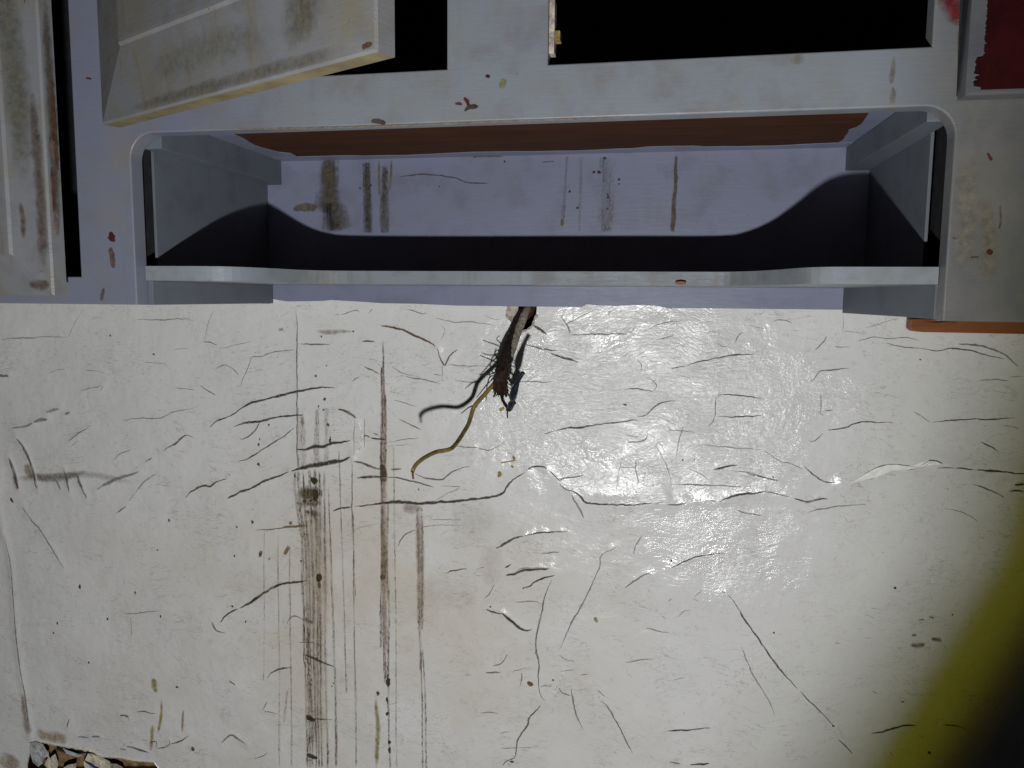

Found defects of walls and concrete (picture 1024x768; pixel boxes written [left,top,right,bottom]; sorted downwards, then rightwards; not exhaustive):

crack [813,322,1018,381]
crack [811,410,891,442]
peeling [848,460,942,484]
crack [915,412,1024,497]
damp [375,349,397,764]
crack [9,309,865,765]
damp [269,444,354,766]
crack [876,725,922,737]